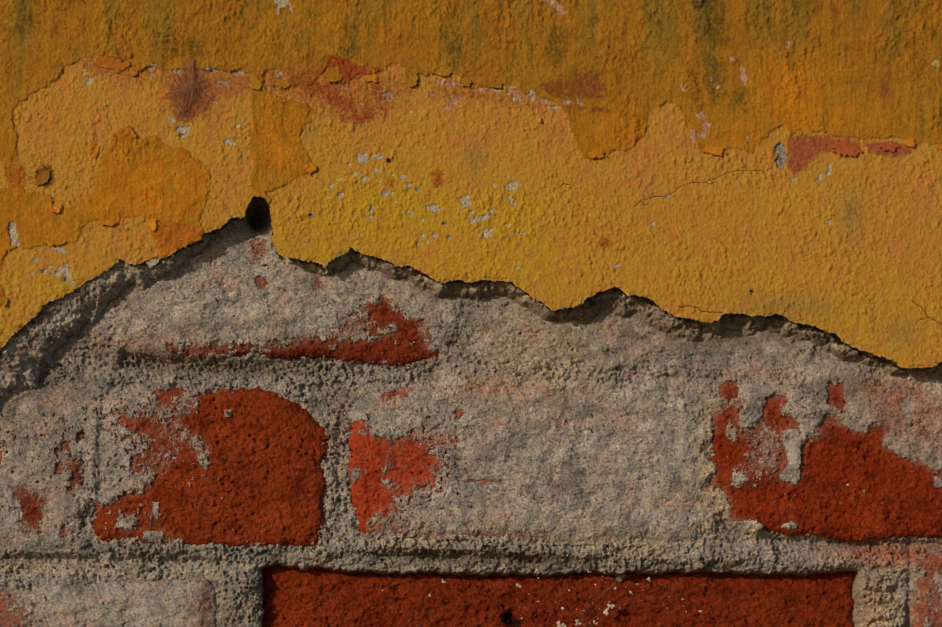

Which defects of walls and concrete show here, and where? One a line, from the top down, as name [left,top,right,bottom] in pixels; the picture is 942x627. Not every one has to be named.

crack [633,168,771,208]
peeling [0,54,942,412]
spalling [503,611,520,627]